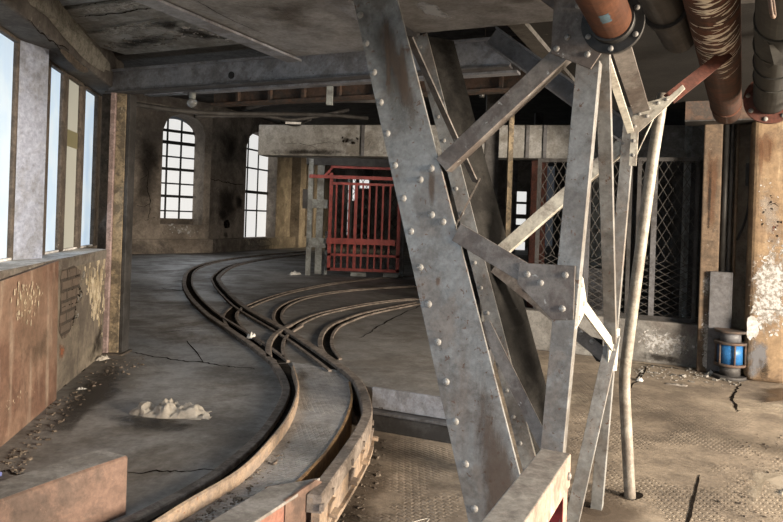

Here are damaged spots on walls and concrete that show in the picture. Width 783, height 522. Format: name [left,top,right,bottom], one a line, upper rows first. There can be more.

crack [66,0,150,17]
peeling [747,195,783,340]
flaking render [59,259,106,339]
crack [135,328,254,369]
crack [730,383,742,411]
water stain [760,388,783,407]
crack [128,467,214,475]